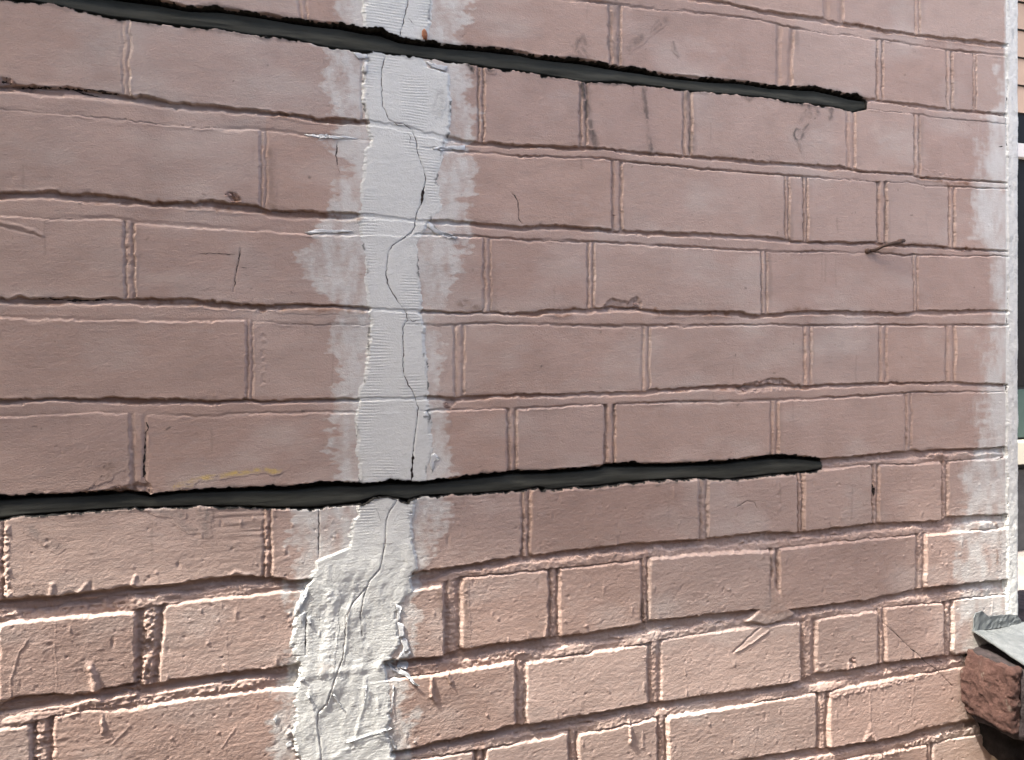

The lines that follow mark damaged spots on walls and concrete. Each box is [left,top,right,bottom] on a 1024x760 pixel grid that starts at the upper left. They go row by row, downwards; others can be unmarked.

crack [2,77,119,97]
crack [198,250,245,288]
crack [38,295,113,303]
crack [317,4,426,757]
crack [142,422,150,483]